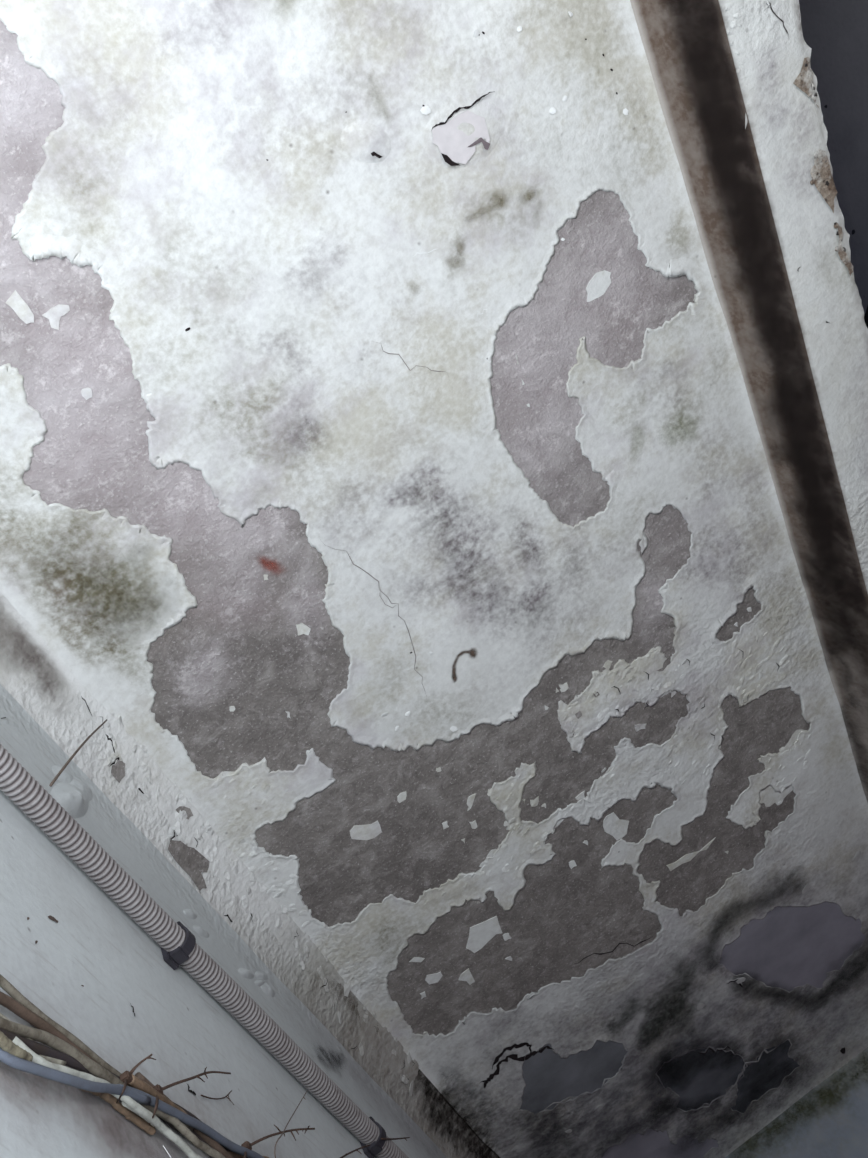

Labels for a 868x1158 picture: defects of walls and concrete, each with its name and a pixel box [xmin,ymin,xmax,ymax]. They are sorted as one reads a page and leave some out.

peeling [722,0,762,129]
spalling [793,57,827,108]
peeling [0,4,710,1096]
peeling [709,574,766,647]
peeling [382,682,816,1042]
peeling [717,884,867,994]
water stain [642,970,692,1044]
water stain [736,957,868,1006]
crack [479,1042,554,1088]
water stain [424,1078,500,1158]